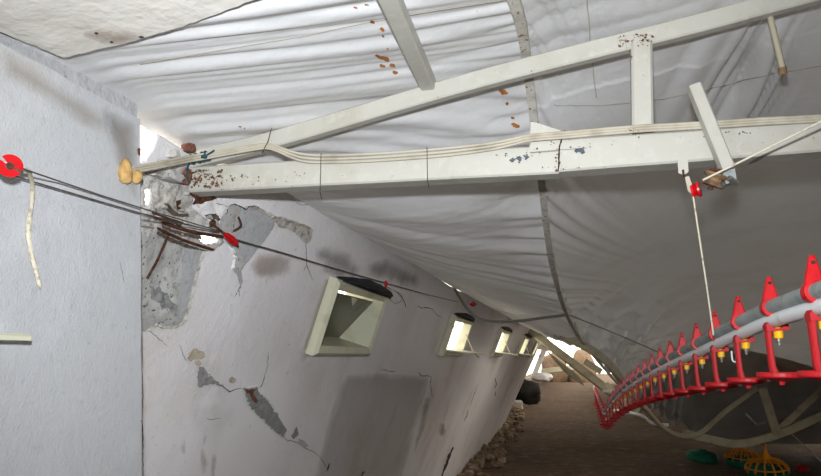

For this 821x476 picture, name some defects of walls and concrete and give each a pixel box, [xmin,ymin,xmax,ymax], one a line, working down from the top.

corrosion [189,169,259,190]
spalling [140,160,313,332]
crack [141,331,186,473]
spalling [188,349,309,447]
crack [442,447,454,476]